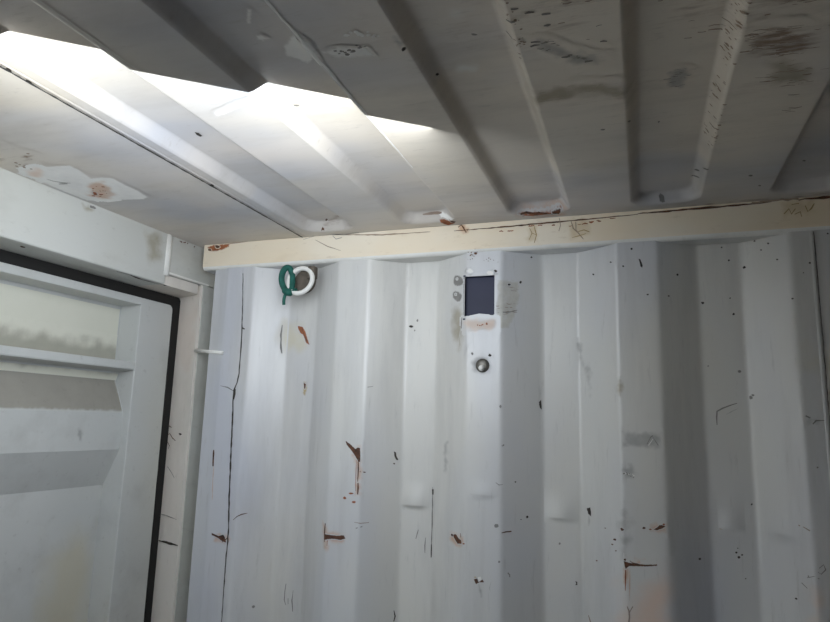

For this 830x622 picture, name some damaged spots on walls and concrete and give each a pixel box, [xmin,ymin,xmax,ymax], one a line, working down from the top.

peeling [16,164,151,203]
rust [455,194,830,246]